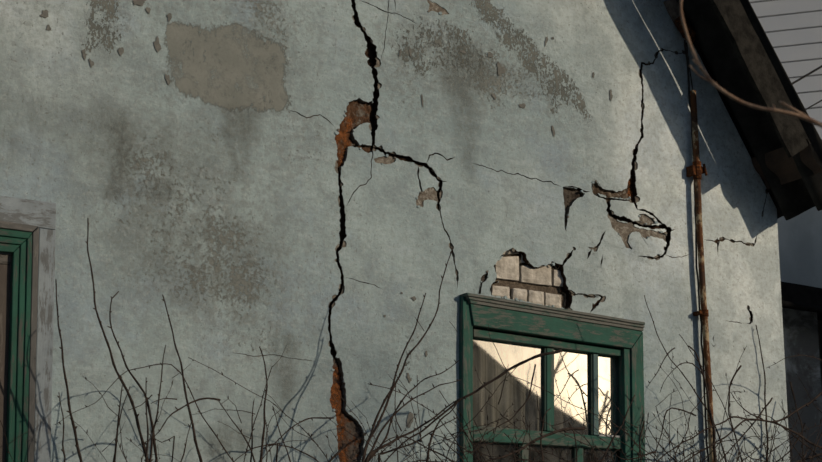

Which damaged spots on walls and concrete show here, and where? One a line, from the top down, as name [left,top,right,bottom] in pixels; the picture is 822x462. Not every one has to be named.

peeling [154,13,291,112]
peeling [395,0,505,77]
peeling [469,0,593,137]
corrosion [335,116,352,167]
crack [328,0,459,358]
spalling [478,248,568,309]
crack [473,48,690,313]
spalling [563,180,631,230]
spalling [608,214,667,249]
crack [708,236,757,257]
crack [236,353,312,361]
corrosion [330,367,347,462]